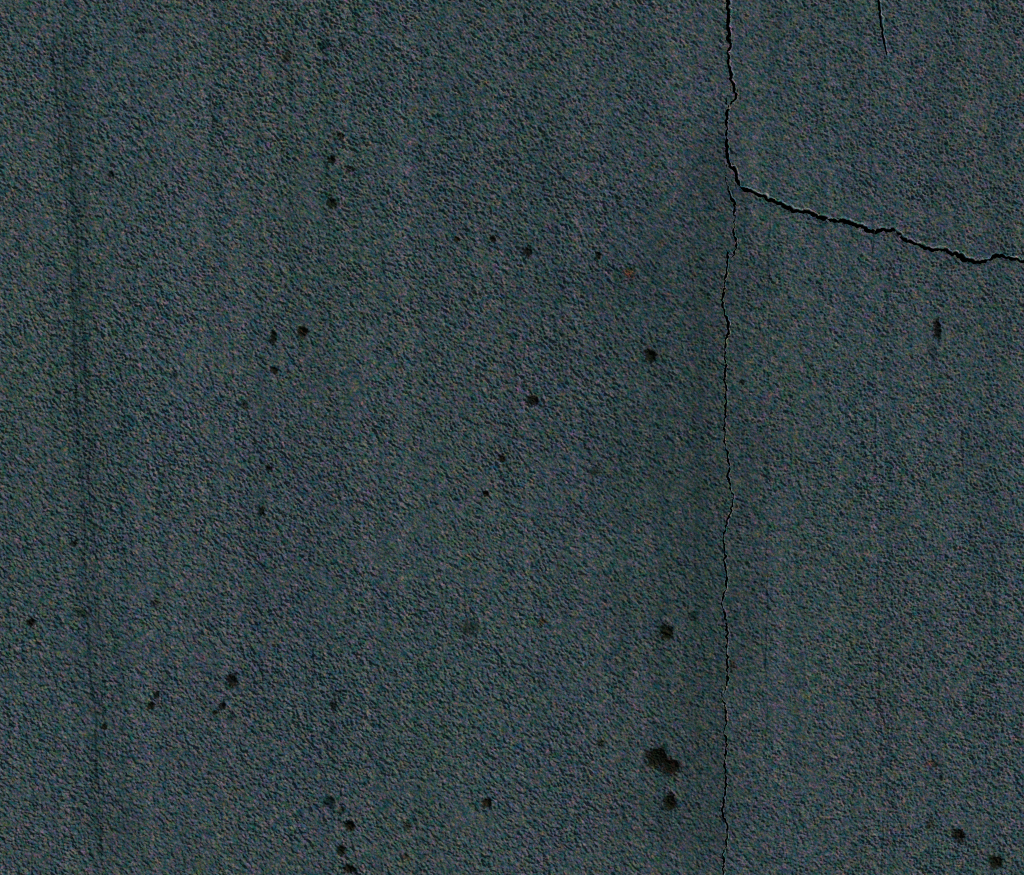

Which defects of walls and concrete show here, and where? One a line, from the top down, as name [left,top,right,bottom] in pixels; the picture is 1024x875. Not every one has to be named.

crack [719,0,1024,875]